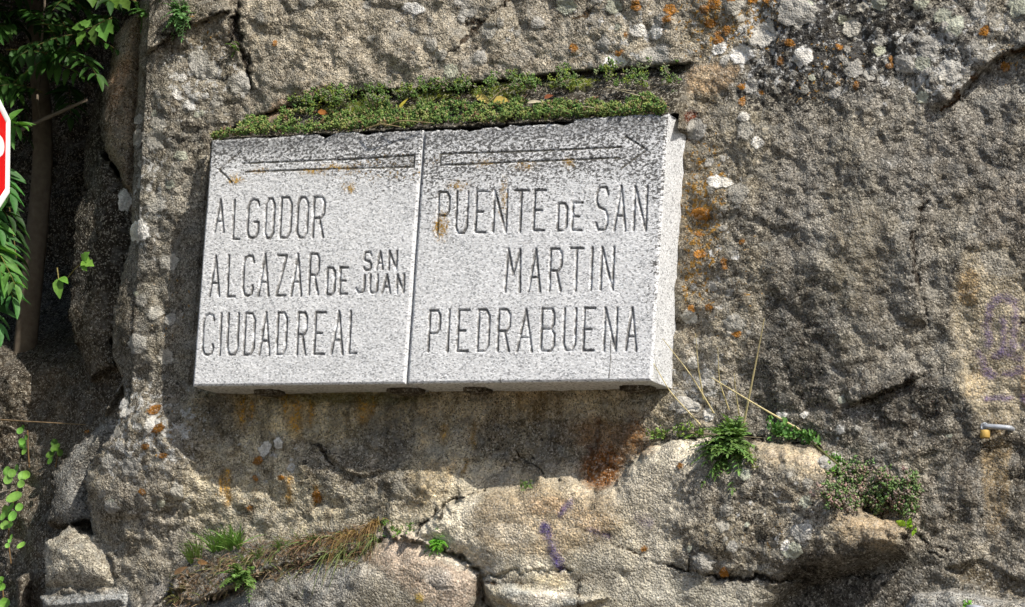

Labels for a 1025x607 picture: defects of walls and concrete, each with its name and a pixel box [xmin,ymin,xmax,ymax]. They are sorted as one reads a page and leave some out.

crack [151,2,252,88]
crack [940,46,1025,112]
crack [312,443,335,469]
rust [582,417,622,489]
crack [387,490,486,541]
crack [481,581,521,607]